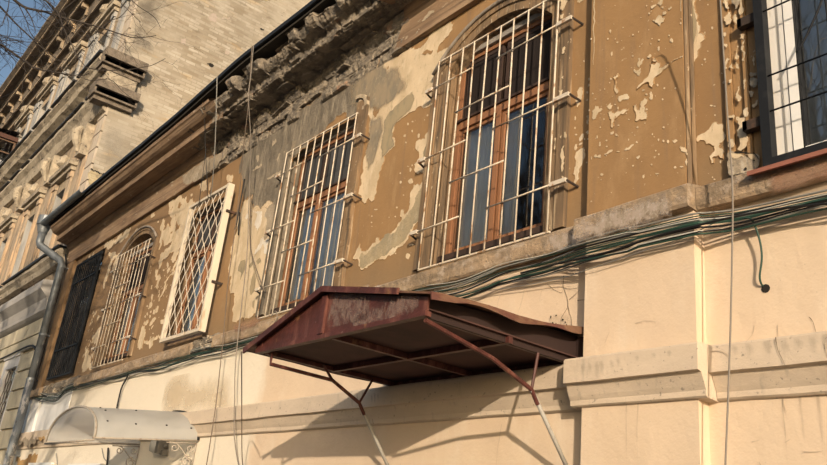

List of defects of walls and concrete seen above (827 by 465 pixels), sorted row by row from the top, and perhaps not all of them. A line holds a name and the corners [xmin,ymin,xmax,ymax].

peeling [607,0,681,43]
flaking render [692,0,713,65]
flaking render [723,0,744,47]
peeling [554,35,683,188]
flaking render [696,34,760,177]
flaking render [137,0,454,350]
flaking render [103,228,138,288]
flaking render [15,435,45,465]